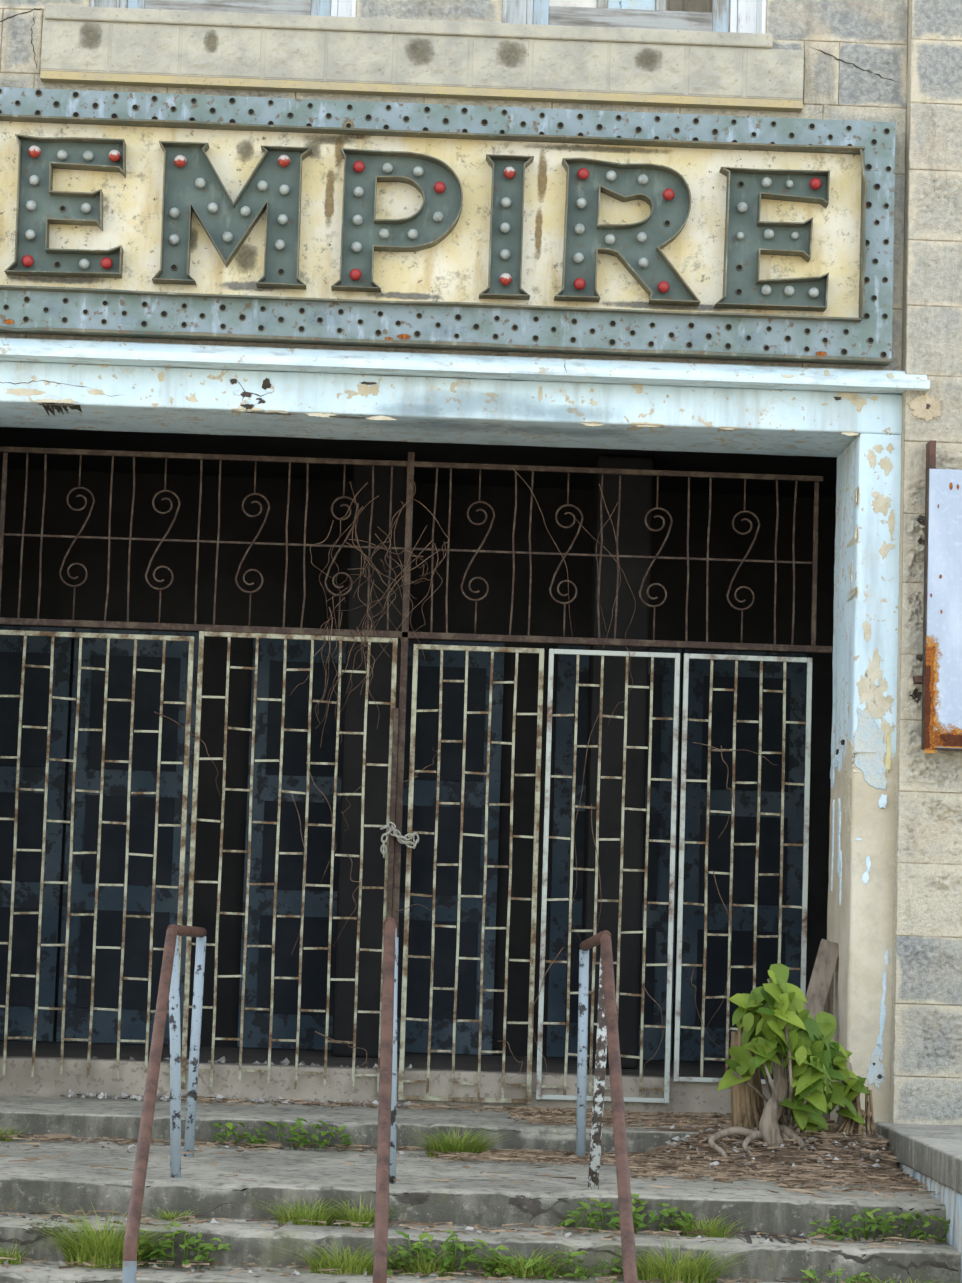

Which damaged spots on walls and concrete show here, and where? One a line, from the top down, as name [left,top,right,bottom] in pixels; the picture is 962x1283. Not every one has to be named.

crack [811,47,900,83]
peeling [627,422,664,431]
peeling [867,443,894,477]
peeling [854,486,895,560]
peeling [846,524,859,601]
corrosion [924,636,962,753]